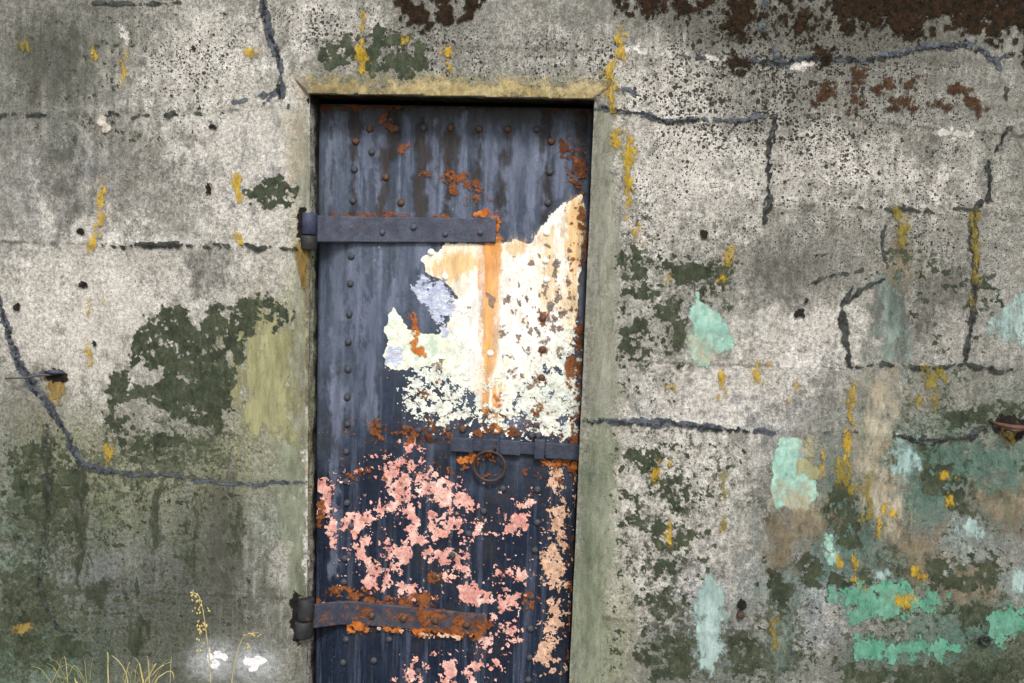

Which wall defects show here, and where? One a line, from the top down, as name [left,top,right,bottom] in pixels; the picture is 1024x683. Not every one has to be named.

crack [231,0,290,108]
crack [594,87,796,225]
crack [679,0,1013,375]
rust [340,134,590,485]
peeling [383,194,584,443]
crack [0,296,307,638]
rust [316,499,326,528]
rust [316,570,494,641]
peeling [317,436,571,683]
crack [582,417,777,437]
peeling [770,436,824,511]
peeling [826,576,962,665]